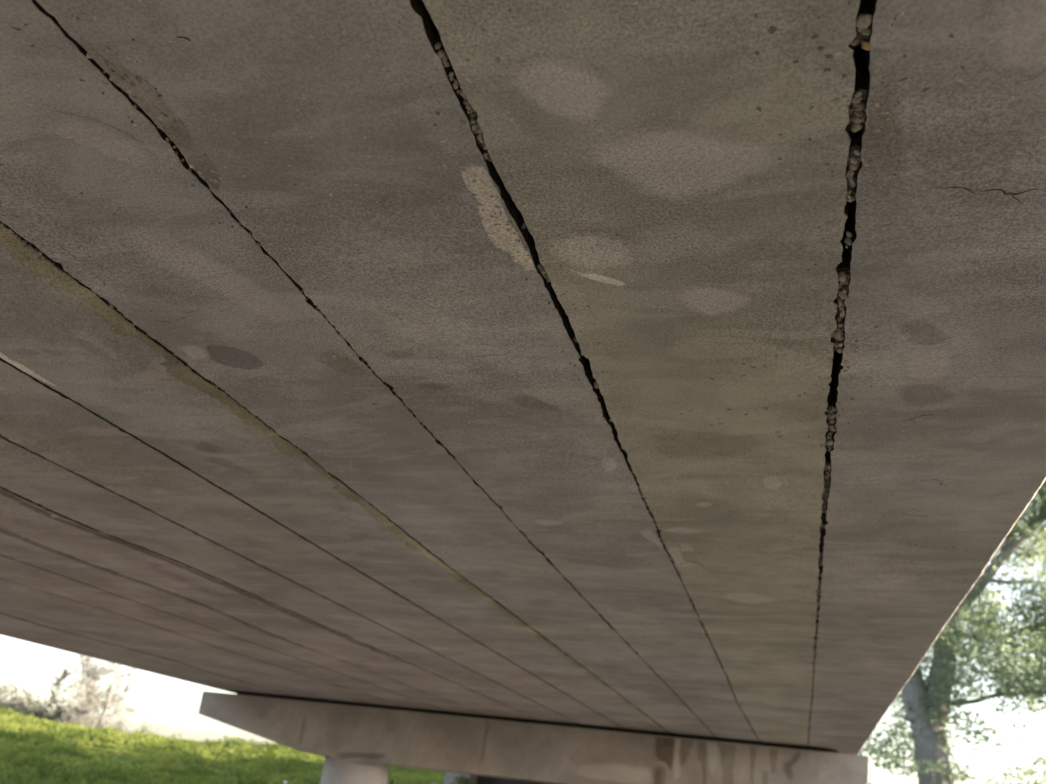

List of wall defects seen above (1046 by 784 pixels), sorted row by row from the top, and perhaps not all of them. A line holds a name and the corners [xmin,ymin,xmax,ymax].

efflorescence [457,154,634,288]
crack [941,187,1046,202]
crack [0,0,760,748]
crack [799,0,896,745]
leakage [565,739,804,784]